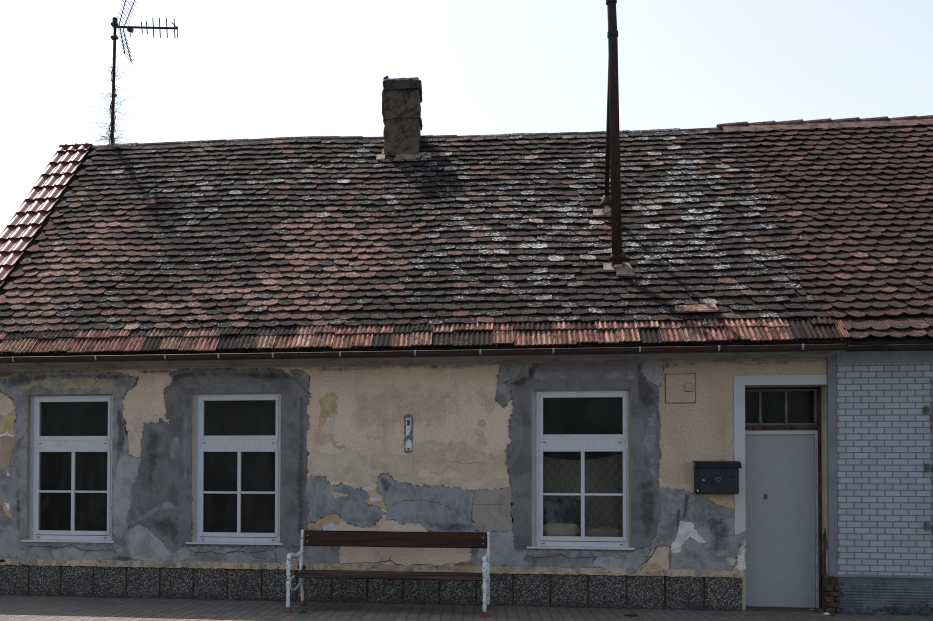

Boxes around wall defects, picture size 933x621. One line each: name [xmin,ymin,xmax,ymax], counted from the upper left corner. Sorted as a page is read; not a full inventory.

flaking render [0,368,340,570]
flaking render [305,361,746,577]